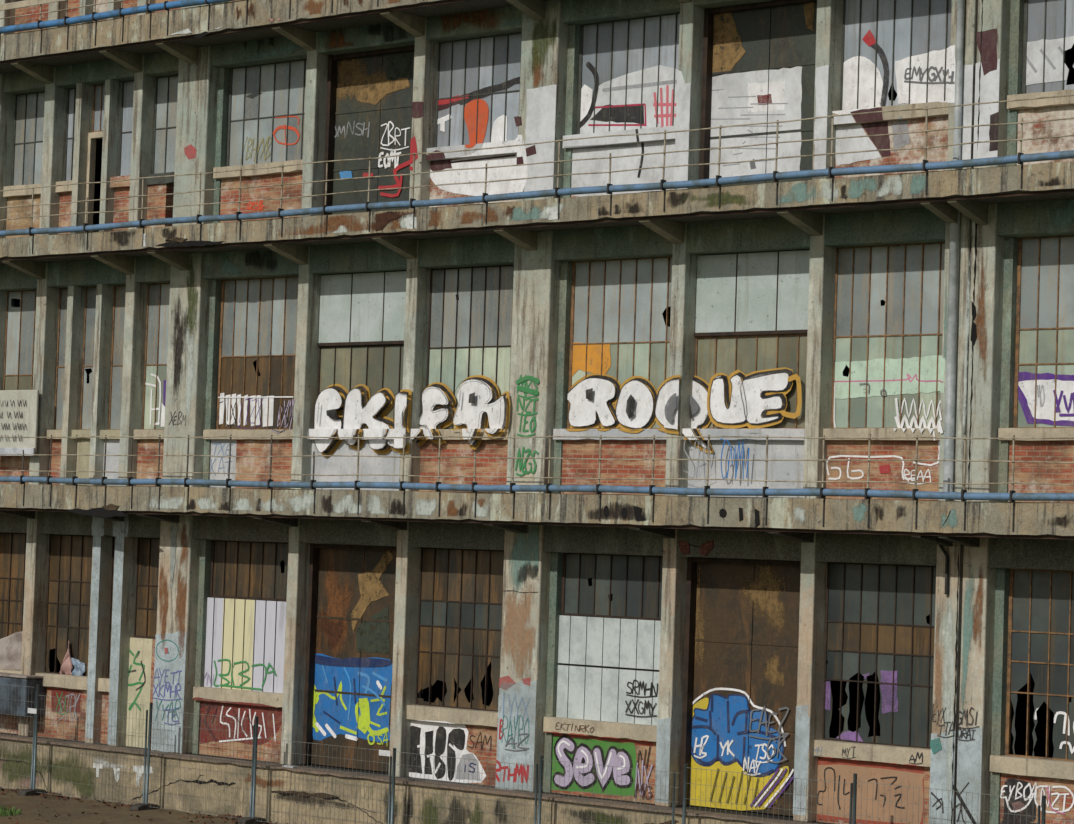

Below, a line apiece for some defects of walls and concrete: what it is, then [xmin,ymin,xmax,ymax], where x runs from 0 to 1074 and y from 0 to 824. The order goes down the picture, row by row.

damp [171,259,198,415]
rust [159,526,188,654]
crack [951,551,959,824]
damp [0,746,95,797]
crack [132,775,235,800]